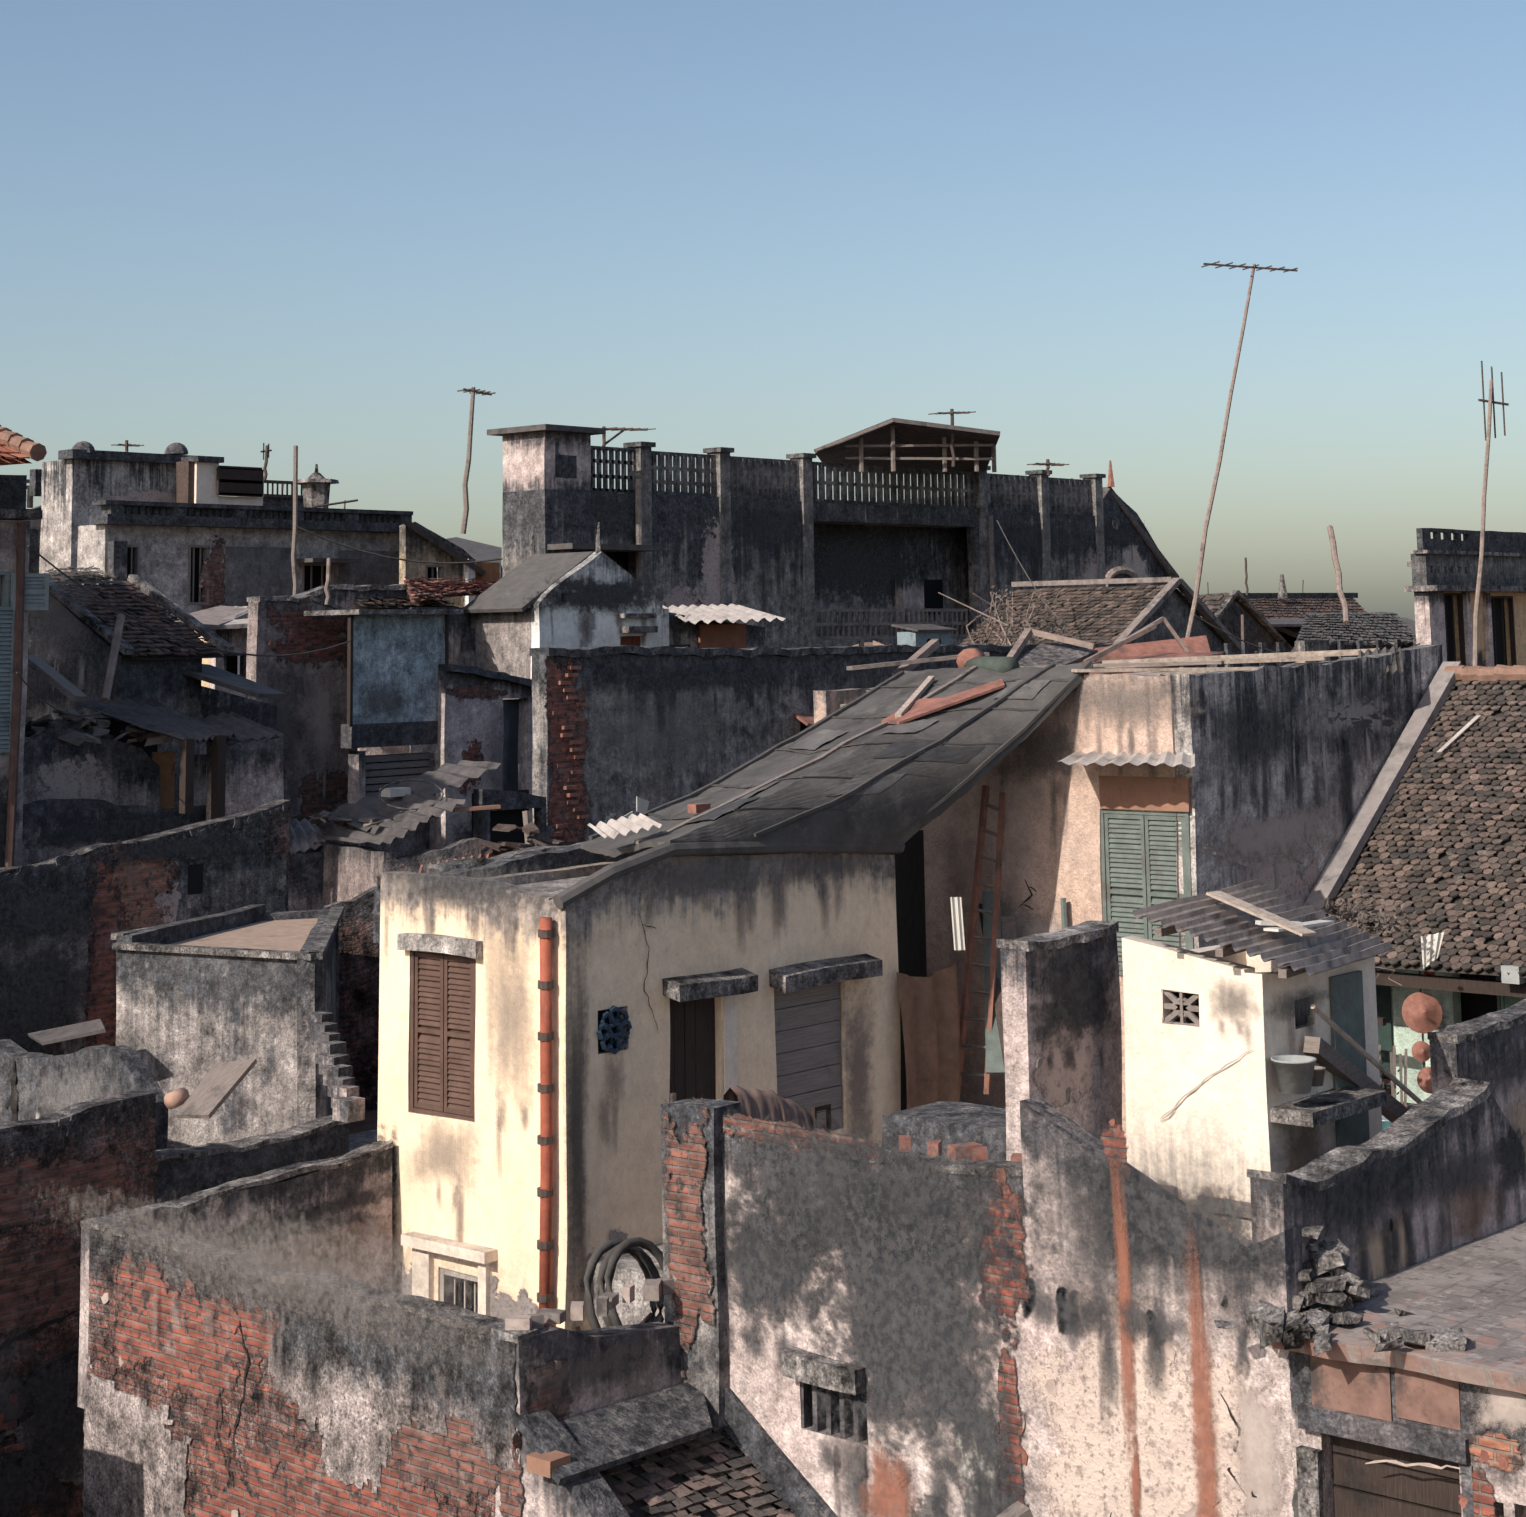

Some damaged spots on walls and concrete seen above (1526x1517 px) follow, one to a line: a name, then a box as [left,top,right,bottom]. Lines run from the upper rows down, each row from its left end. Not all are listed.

water stain [529,575,665,644]
water stain [586,494,635,541]
water stain [1202,688,1414,890]
spalling [85,830,199,1046]
crack [638,910,658,1029]
crack [1160,1049,1254,1122]
spalling [0,1149,175,1341]
spalling [89,1250,524,1517]
water stain [723,1011,1287,1517]
peeling [906,1167,1281,1517]
rust [1112,1173,1140,1517]
rust [1189,1269,1218,1517]